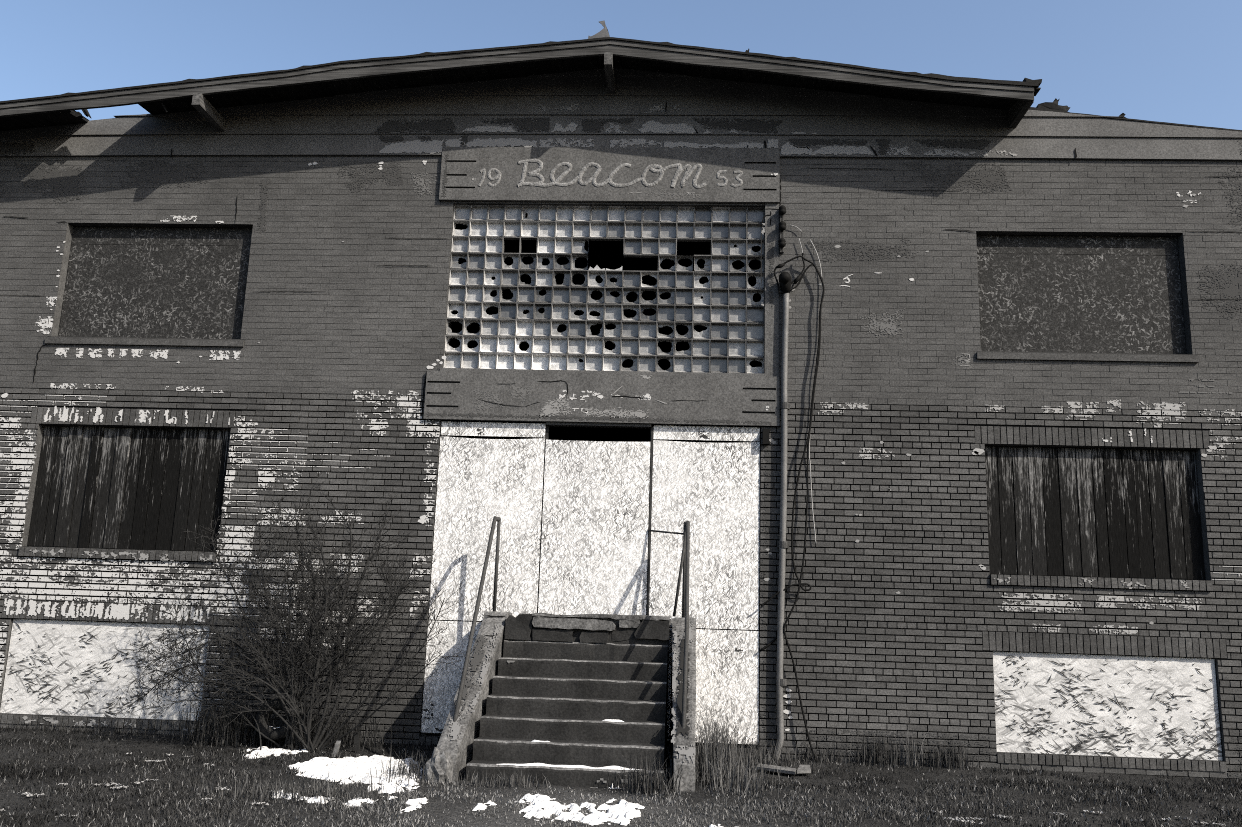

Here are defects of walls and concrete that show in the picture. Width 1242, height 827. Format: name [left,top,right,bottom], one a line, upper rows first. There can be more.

peeling [378,104,1017,170]
peeling [55,348,180,363]
peeling [199,350,241,360]
peeling [818,402,868,415]
peeling [1041,399,1121,420]
peeling [1136,379,1242,460]
peeling [0,383,440,647]
peeling [998,593,1202,634]